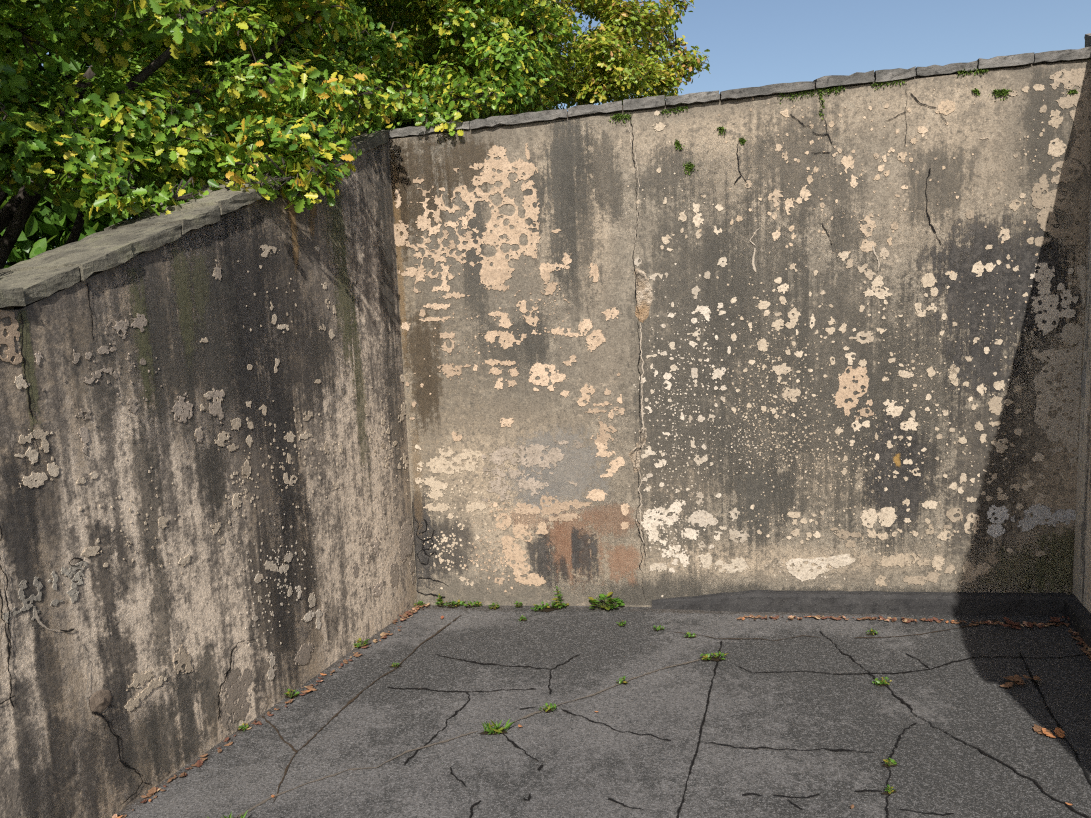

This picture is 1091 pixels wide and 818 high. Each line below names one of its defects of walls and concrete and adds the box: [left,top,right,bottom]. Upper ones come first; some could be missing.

peeling [0,310,43,389]
peeling [14,429,60,488]
peeling [72,313,160,414]
leakage [129,214,306,539]
leakage [375,141,448,427]
crack [628,118,646,595]
peeling [352,67,1091,598]
leakage [861,414,933,540]
leakage [916,214,1081,404]
crack [218,639,255,720]
crack [387,654,669,764]
crack [709,631,1090,818]